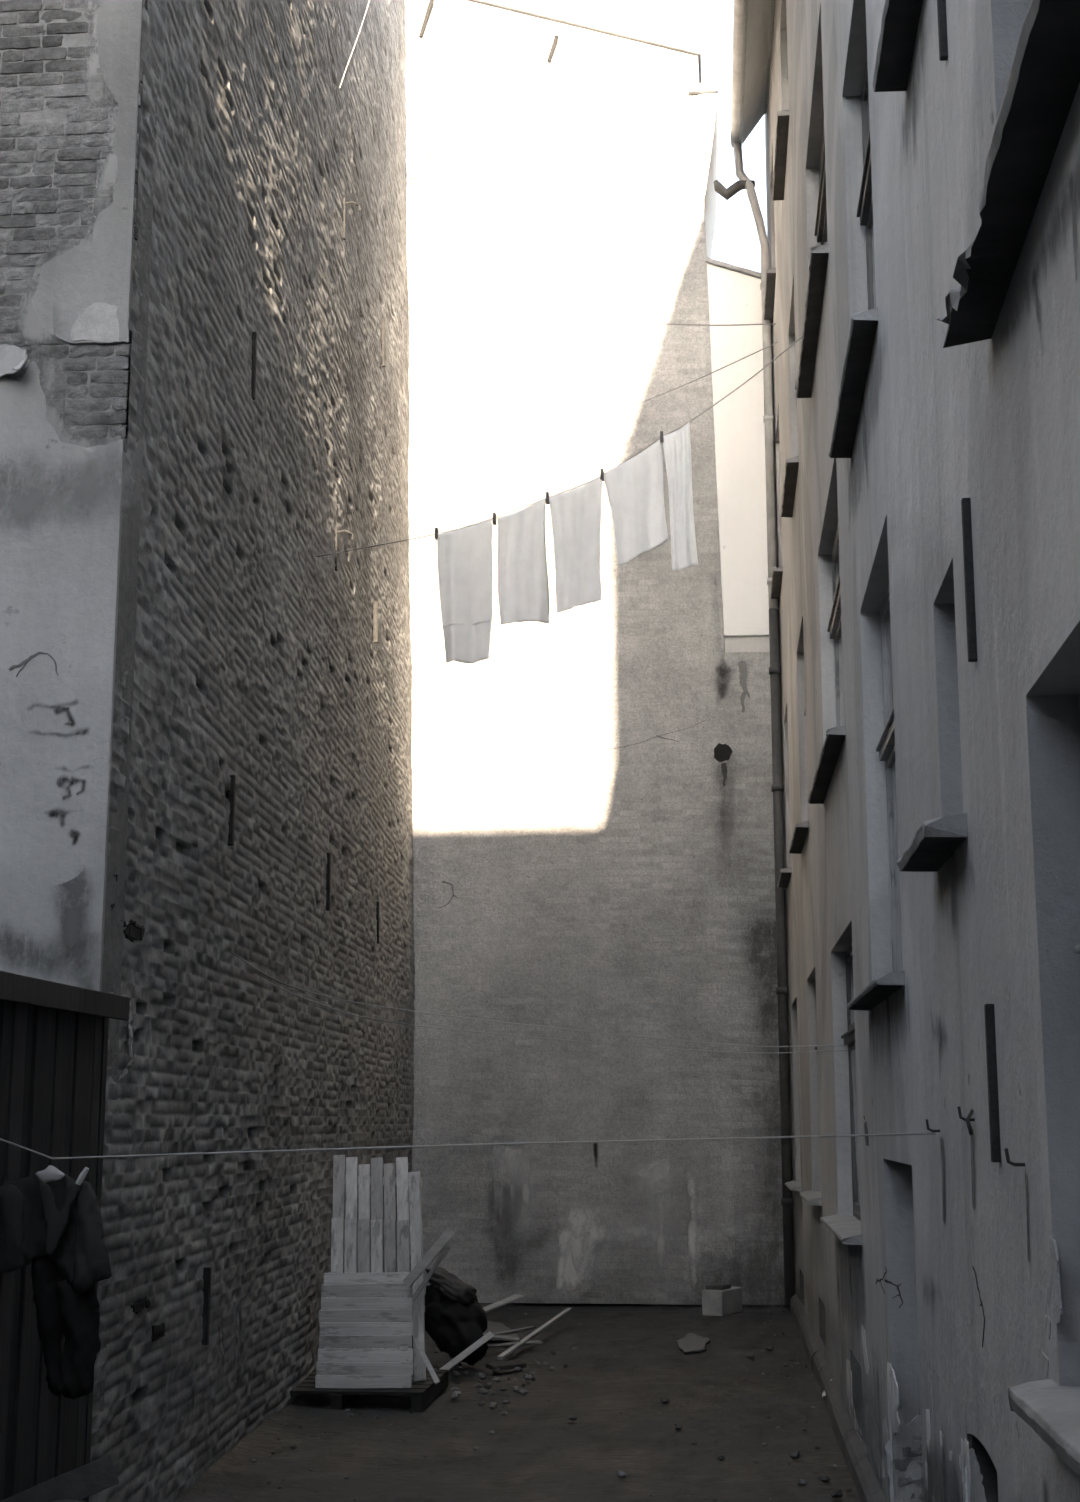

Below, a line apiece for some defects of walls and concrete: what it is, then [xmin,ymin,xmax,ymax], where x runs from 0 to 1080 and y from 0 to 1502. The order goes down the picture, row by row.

spalling [0,0,140,453]
crack [738,661,750,713]
crack [876,1266,903,1308]
crack [972,1266,985,1347]
spalling [846,1325,987,1502]